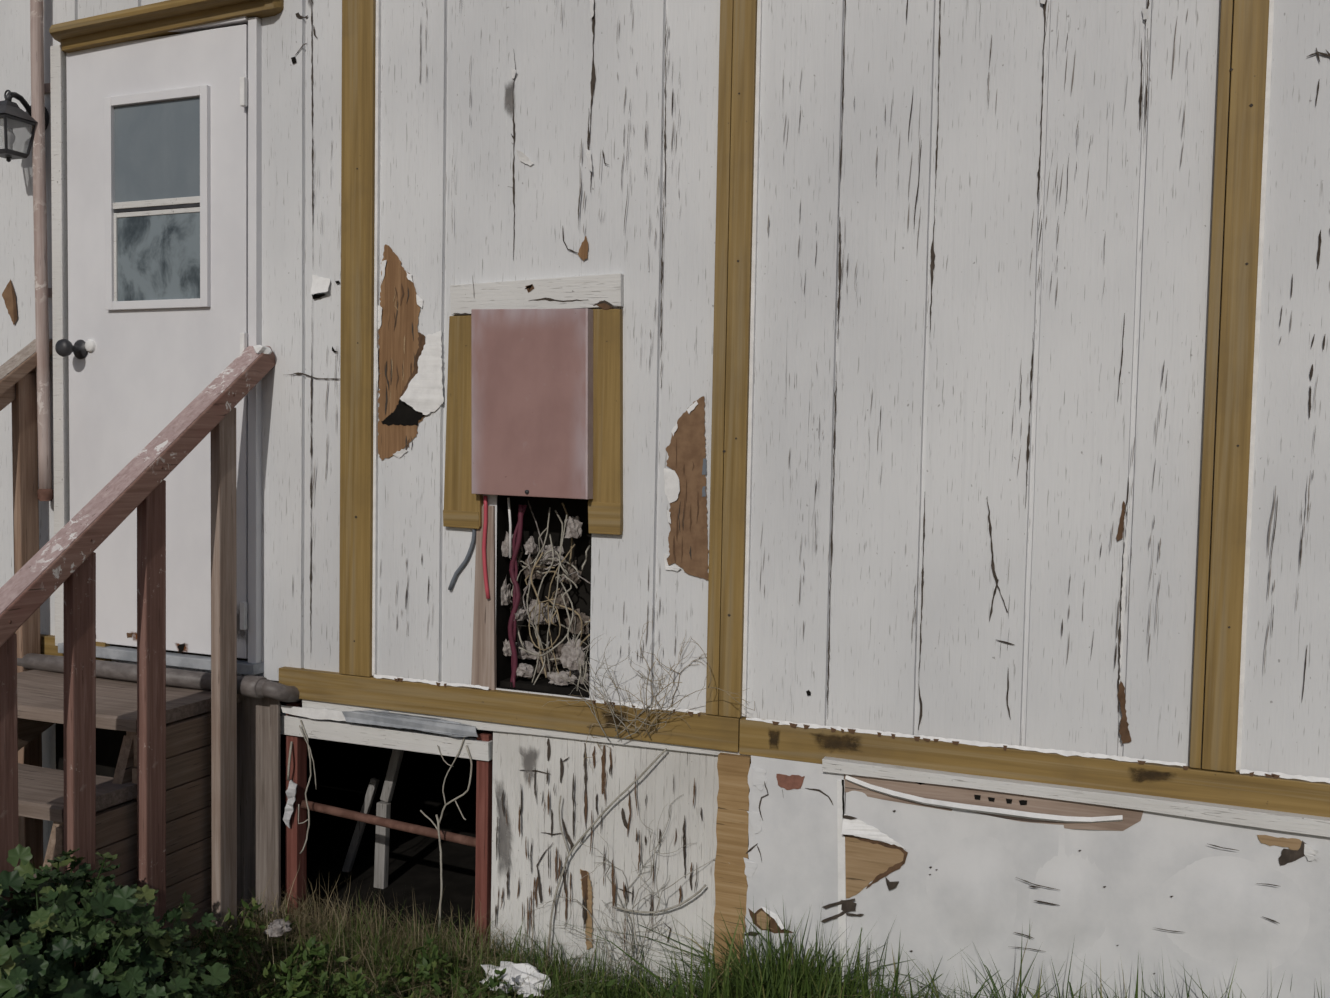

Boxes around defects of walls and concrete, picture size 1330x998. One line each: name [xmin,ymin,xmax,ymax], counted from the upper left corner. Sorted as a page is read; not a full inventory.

crack [508,0,681,386]
crack [987,39,998,126]
crack [1030,0,1091,300]
peeling [2,279,17,325]
peeling [377,244,444,460]
peeling [663,396,709,580]
crack [760,0,948,730]
crack [1012,332,1034,508]
crack [987,499,1014,719]
peeling [761,906,784,930]
peeling [743,768,805,879]
peeling [842,814,907,850]